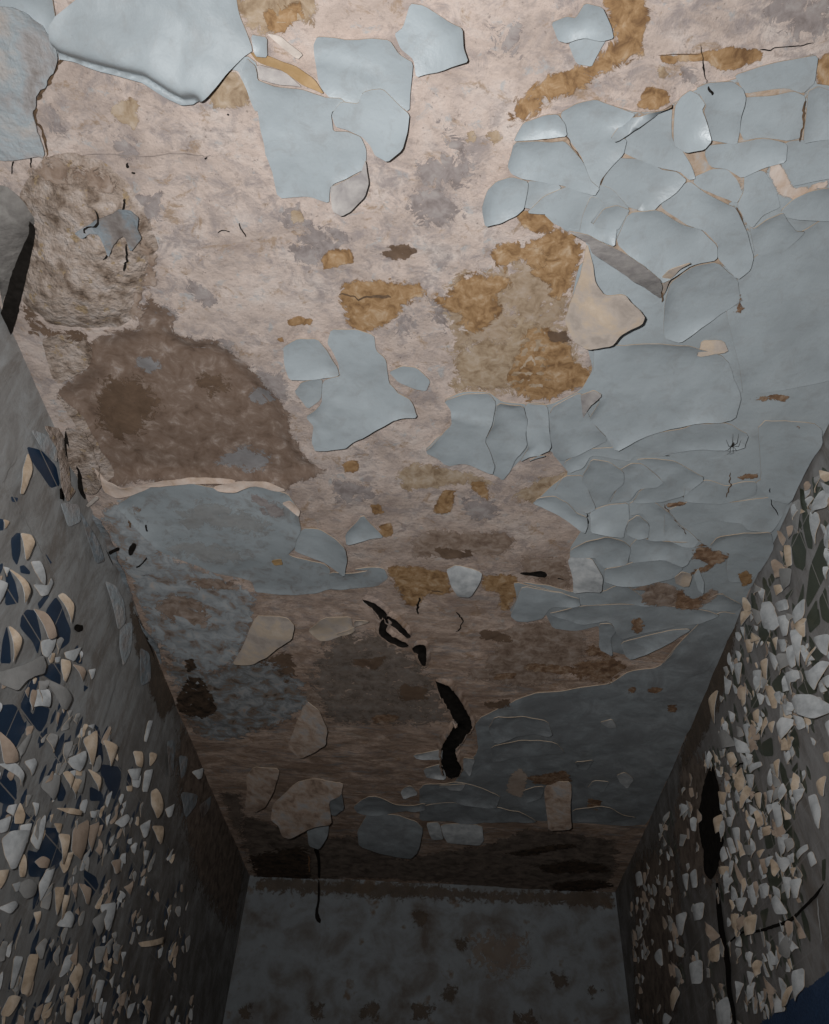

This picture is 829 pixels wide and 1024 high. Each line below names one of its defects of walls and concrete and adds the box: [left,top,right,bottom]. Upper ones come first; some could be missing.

rust [508,0,650,122]
leakage [763,0,829,44]
leakage [278,202,349,267]
rust [321,249,354,269]
leakage [406,118,479,228]
rust [338,211,592,402]
peeling [11,298,430,758]
peeling [245,54,829,1024]
peeling [0,519,212,1024]
crack [362,590,476,779]
crack [308,848,321,923]
crack [699,756,824,1024]